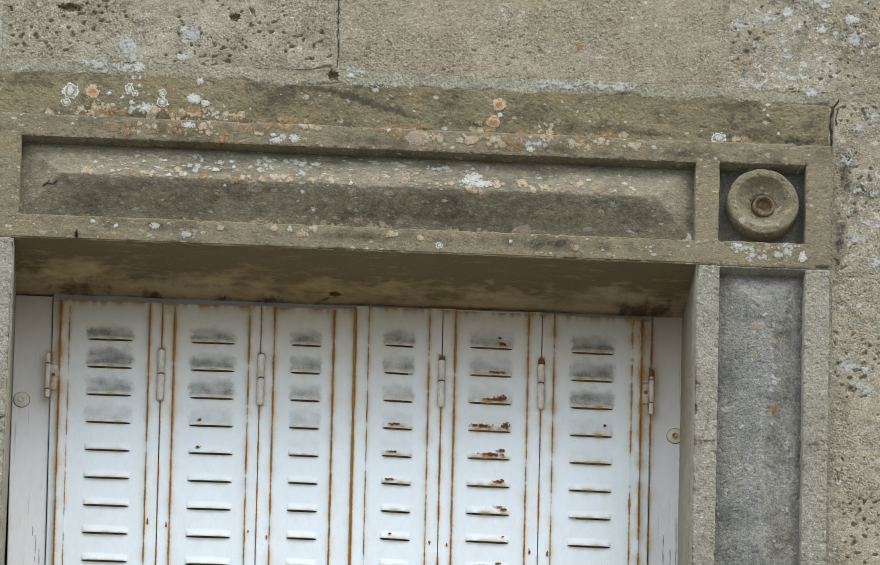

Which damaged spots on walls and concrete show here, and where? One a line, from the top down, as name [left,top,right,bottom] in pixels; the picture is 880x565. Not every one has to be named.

damp [10,233,701,317]
corrosion [45,299,123,565]
corrosion [136,302,186,565]
corrosion [313,292,357,565]
corrosion [472,422,510,430]